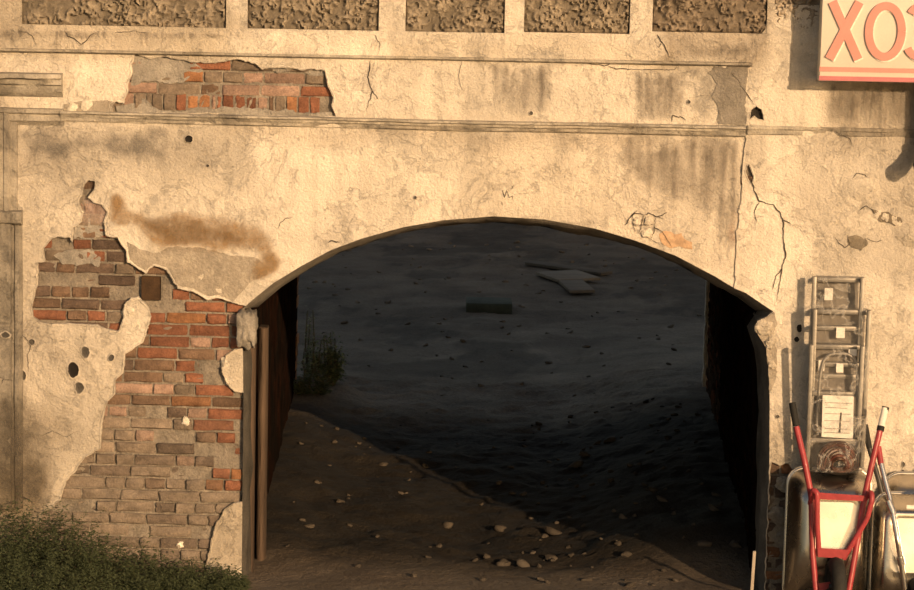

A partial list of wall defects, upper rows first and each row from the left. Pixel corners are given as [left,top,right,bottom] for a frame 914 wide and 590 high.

flaking render [64,54,337,117]
crack [367,35,380,107]
crack [625,212,671,245]
crack [747,167,790,302]
peeling [859,206,902,228]
flaking render [30,179,268,579]